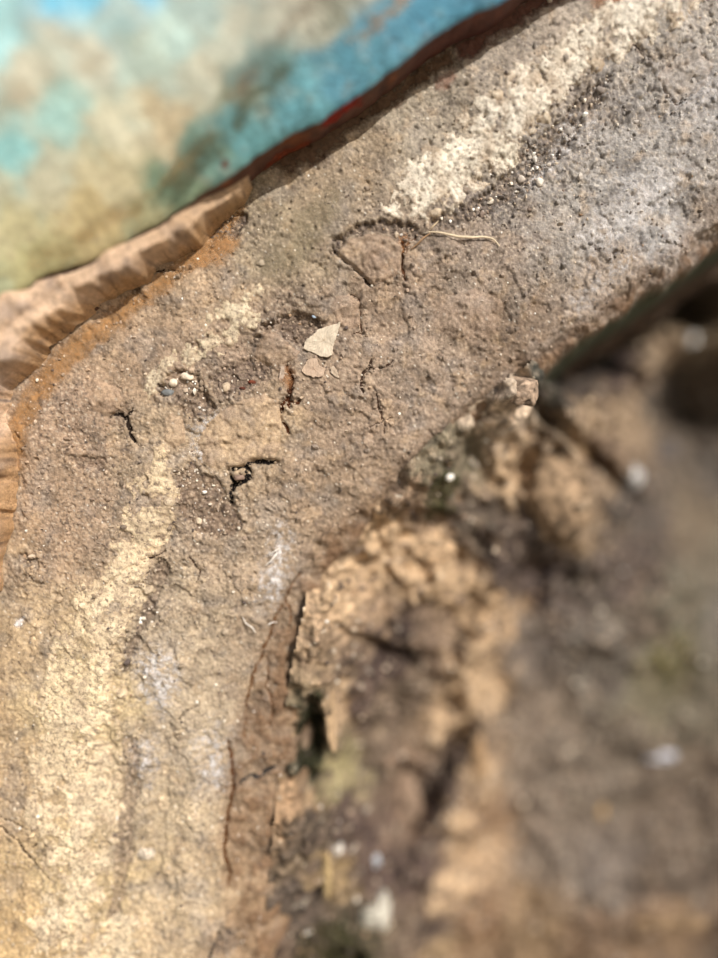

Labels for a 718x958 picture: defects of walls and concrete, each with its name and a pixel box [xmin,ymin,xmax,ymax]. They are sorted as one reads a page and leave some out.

rust [267,0,560,173]
crack [401,238,416,280]
crack [336,254,394,434]
crack [109,408,136,443]
crack [280,365,302,434]
crack [227,459,276,504]
crack [215,573,301,888]